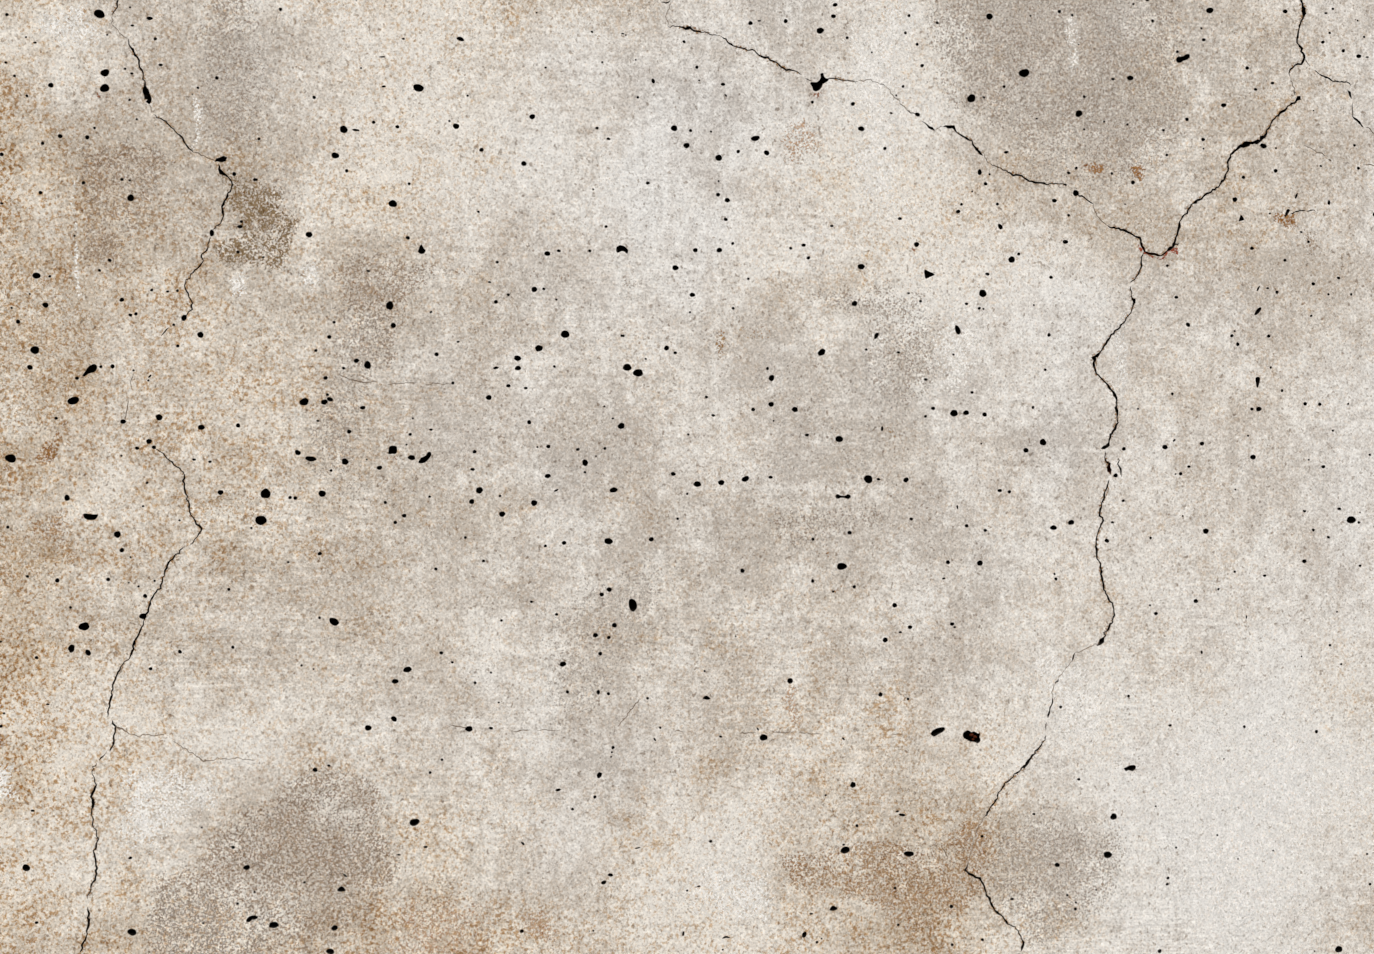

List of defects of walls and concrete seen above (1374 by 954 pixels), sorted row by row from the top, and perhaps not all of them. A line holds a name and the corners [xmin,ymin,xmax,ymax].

crack [111,0,233,336]
crack [80,448,255,952]
crack [660,0,1374,951]